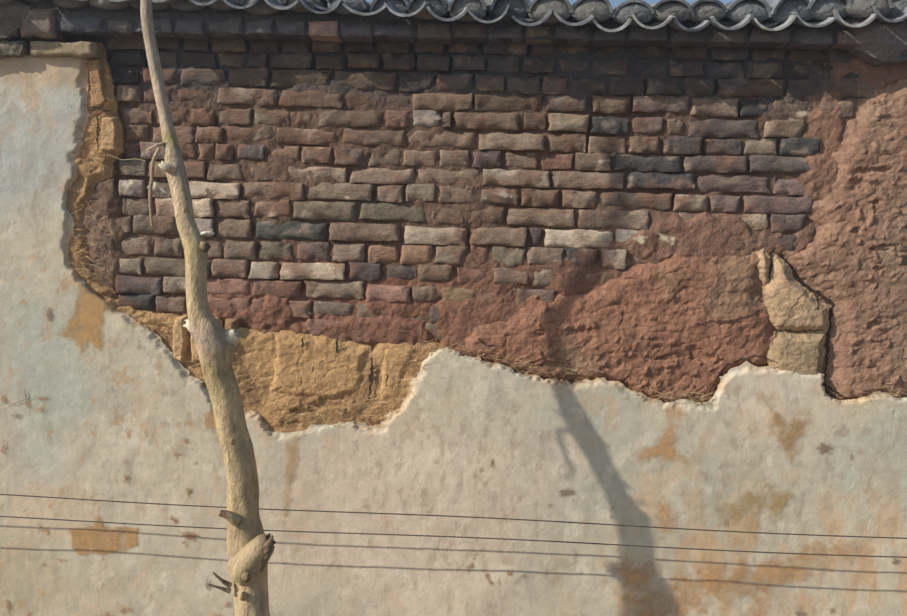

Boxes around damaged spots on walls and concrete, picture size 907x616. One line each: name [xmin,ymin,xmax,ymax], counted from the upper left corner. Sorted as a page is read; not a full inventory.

flaking render [65,37,210,399]
crack [366,357,388,402]
flaking render [156,38,907,433]
crack [696,253,856,399]